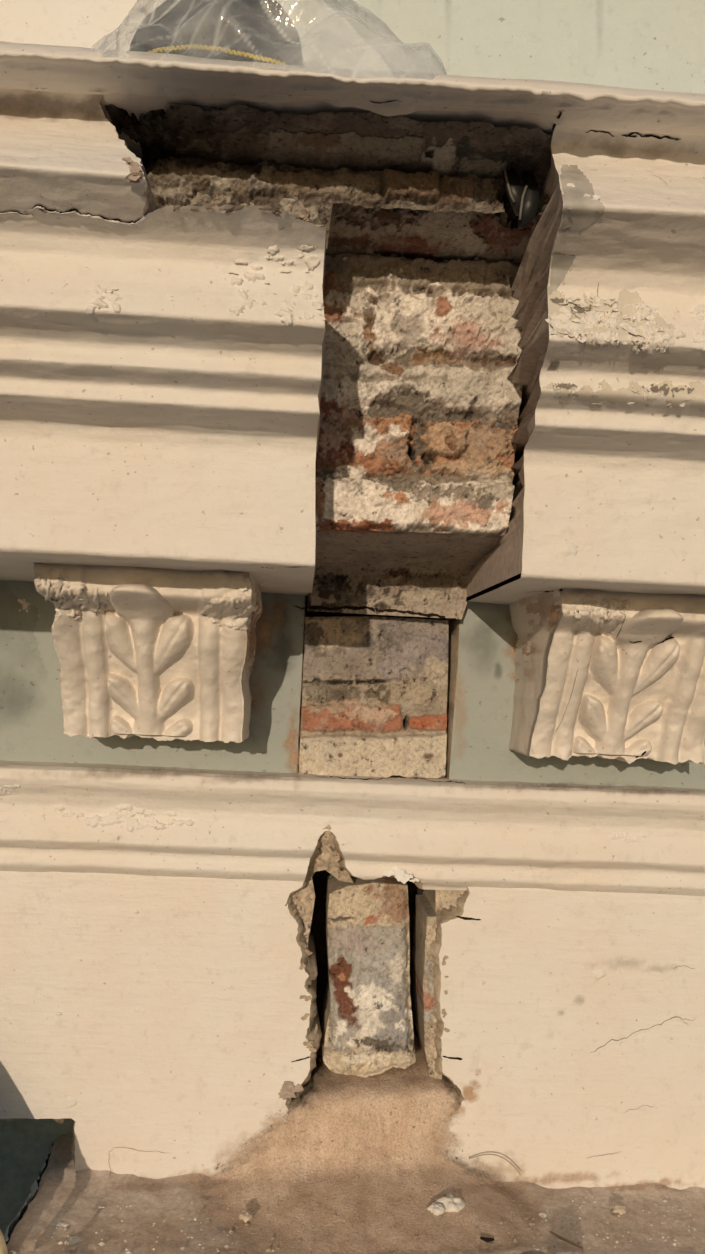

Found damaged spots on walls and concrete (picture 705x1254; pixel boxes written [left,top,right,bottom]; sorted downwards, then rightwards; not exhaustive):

spalling [105,104,604,271]
crack [0,205,147,226]
peeling [531,253,679,358]
peeling [35,568,120,620]
peeling [200,586,258,632]
flaking render [285,824,353,1052]
spalling [383,866,465,1107]
crack [589,1016,697,1056]
spalling [278,1081,303,1100]